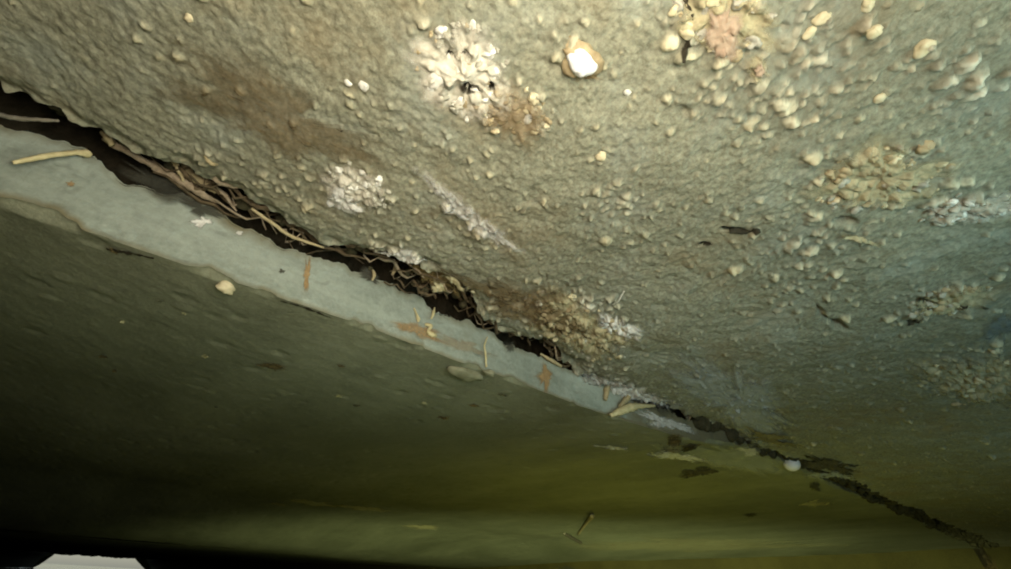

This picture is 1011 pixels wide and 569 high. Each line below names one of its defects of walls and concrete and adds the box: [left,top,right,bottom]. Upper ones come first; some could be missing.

crack [681,0,694,63]
efflorescence [328,188,362,213]
damp [907,192,1011,227]
crack [0,81,591,378]
crack [696,226,761,246]
efflorescence [599,314,641,338]
crack [907,297,936,326]
crack [633,398,1000,569]